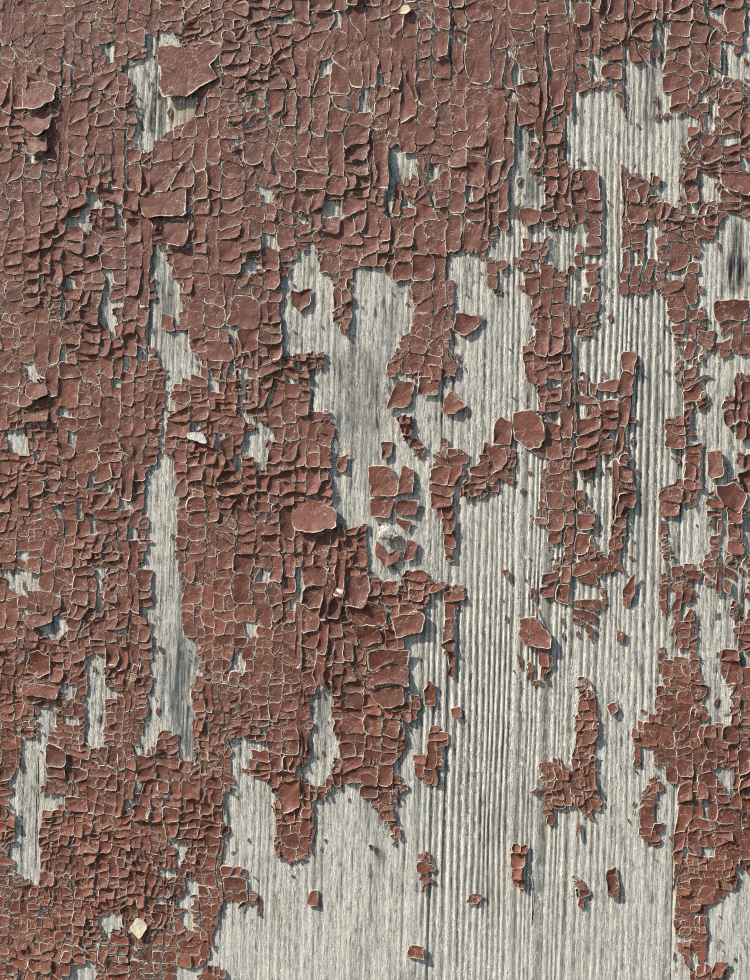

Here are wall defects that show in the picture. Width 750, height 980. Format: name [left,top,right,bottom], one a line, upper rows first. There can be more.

peeling [16,81,56,154]
crack [60,63,132,175]
peeling [114,21,223,164]
crack [161,0,340,138]
crack [449,2,523,101]
crack [660,12,673,61]
crack [705,0,725,120]
peeling [0,347,89,468]
peeling [115,188,283,826]
peeling [143,24,750,980]
peeling [0,553,120,929]
crack [723,581,746,775]